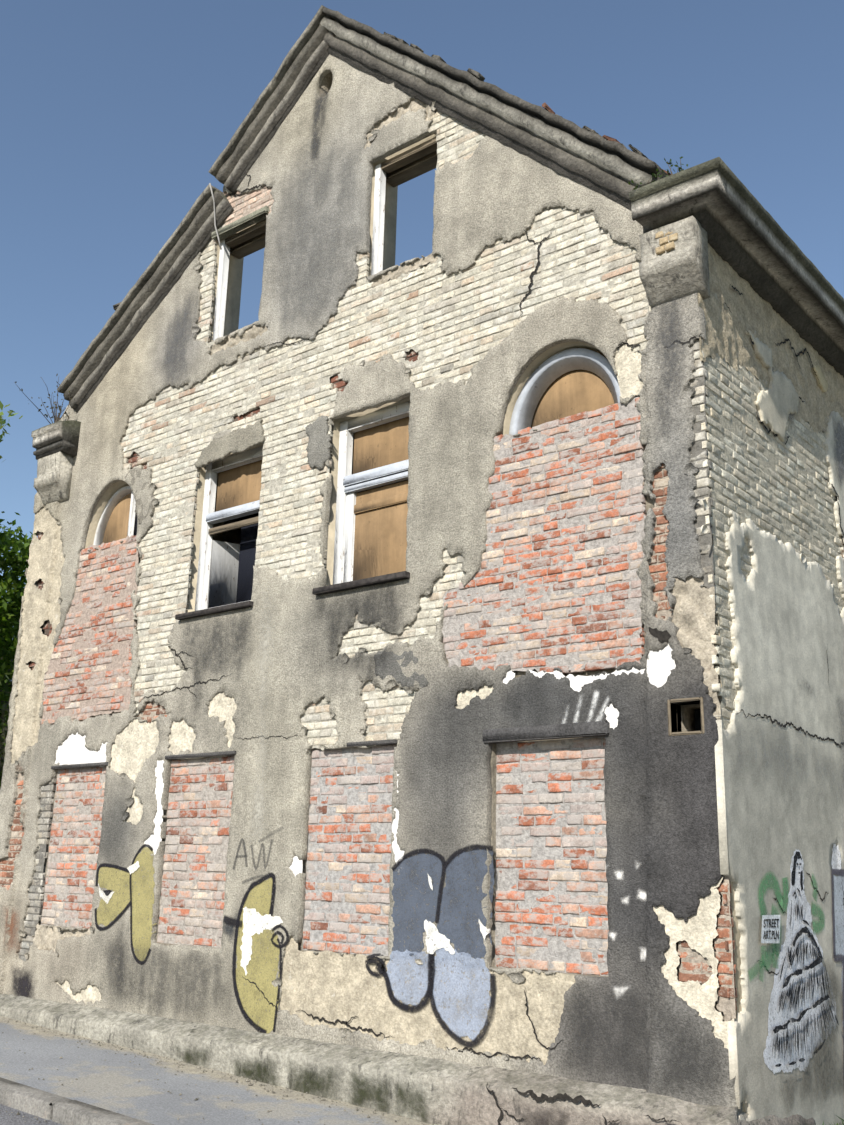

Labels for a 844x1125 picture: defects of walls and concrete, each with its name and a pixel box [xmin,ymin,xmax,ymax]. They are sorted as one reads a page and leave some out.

water stain [312,92,327,158]
crack [518,228,553,320]
spalling [655,231,678,255]
spalling [55,207,652,855]
spalling [529,244,844,730]
crack [824,467,844,545]
flaking render [0,506,94,962]
crack [728,709,844,748]
flaking render [289,856,303,876]
flaking render [392,771,405,872]
flaking render [653,876,738,1049]
crack [444,990,679,1125]